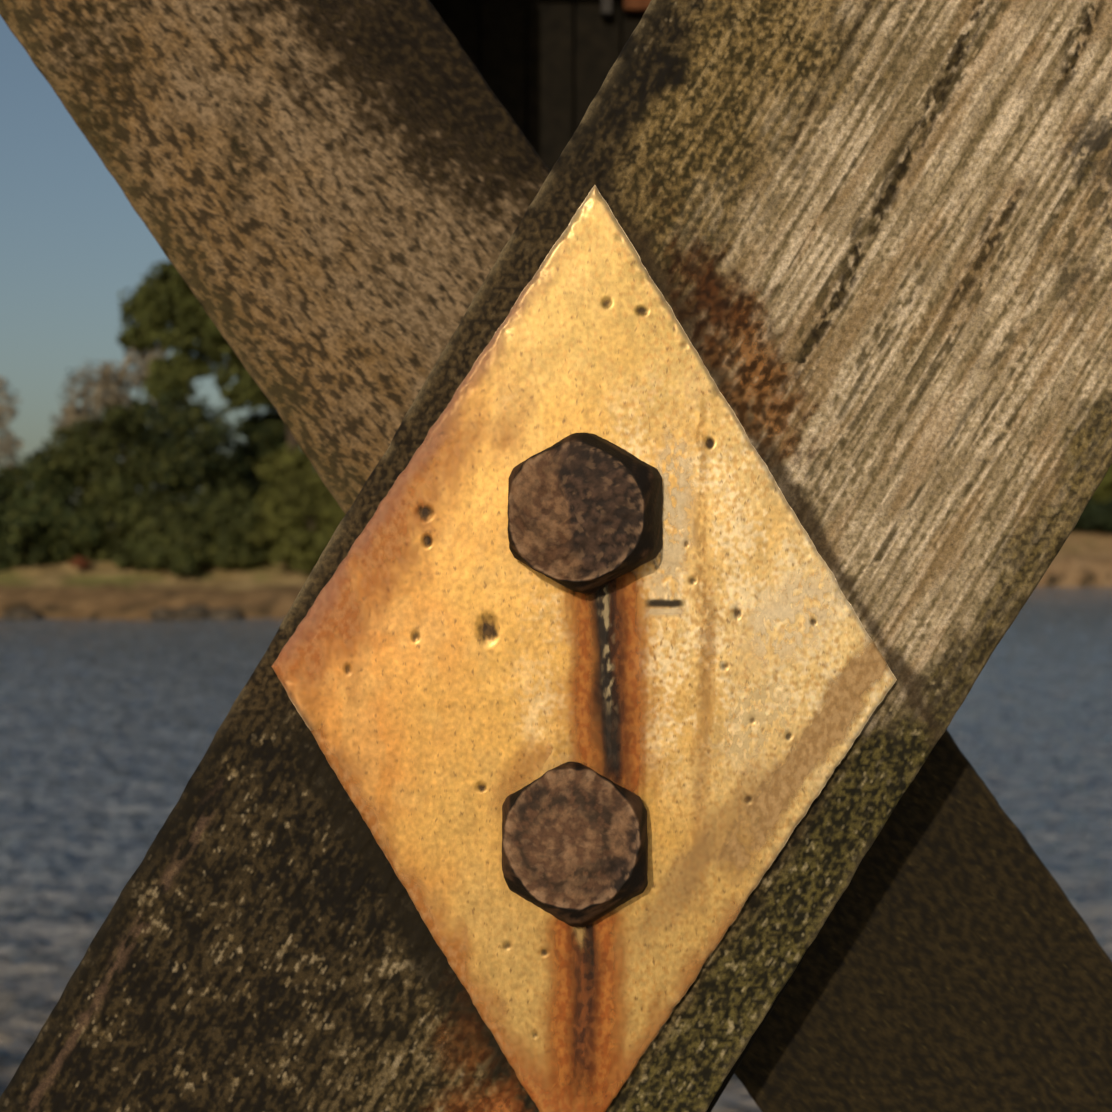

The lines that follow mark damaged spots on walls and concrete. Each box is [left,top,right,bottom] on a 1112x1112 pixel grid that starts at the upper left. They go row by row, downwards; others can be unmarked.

corrosion [669,238,803,458]
corrosion [271,430,462,683]
corrosion [572,570,642,793]
corrosion [311,728,737,1112]